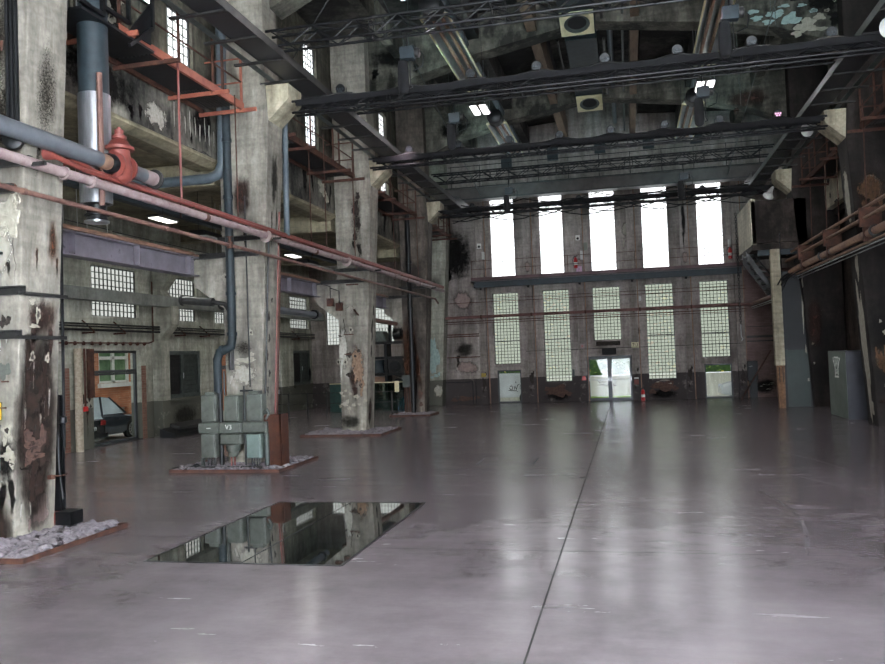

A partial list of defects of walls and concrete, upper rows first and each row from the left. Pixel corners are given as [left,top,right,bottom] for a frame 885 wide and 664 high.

spalling [747,0,836,38]
water stain [37,47,56,130]
spalling [336,305,374,377]
spalling [0,363,11,381]
spalling [339,383,368,410]
spalling [0,424,47,470]